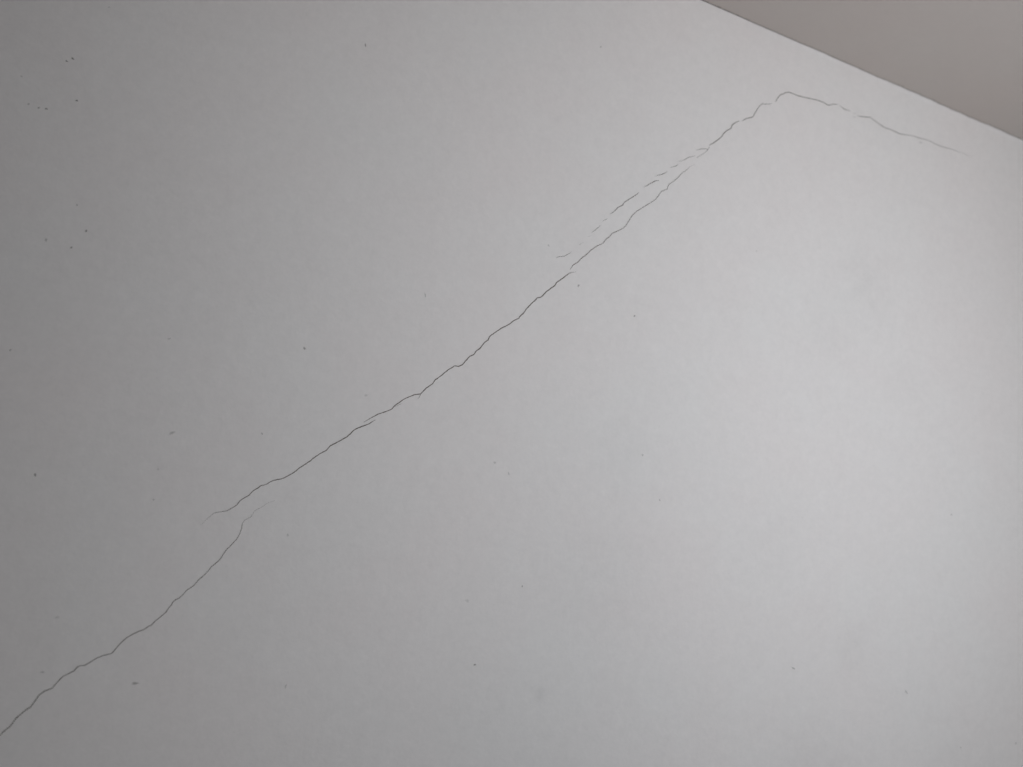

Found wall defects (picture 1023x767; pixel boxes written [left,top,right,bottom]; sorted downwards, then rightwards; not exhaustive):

crack [0,92,969,735]